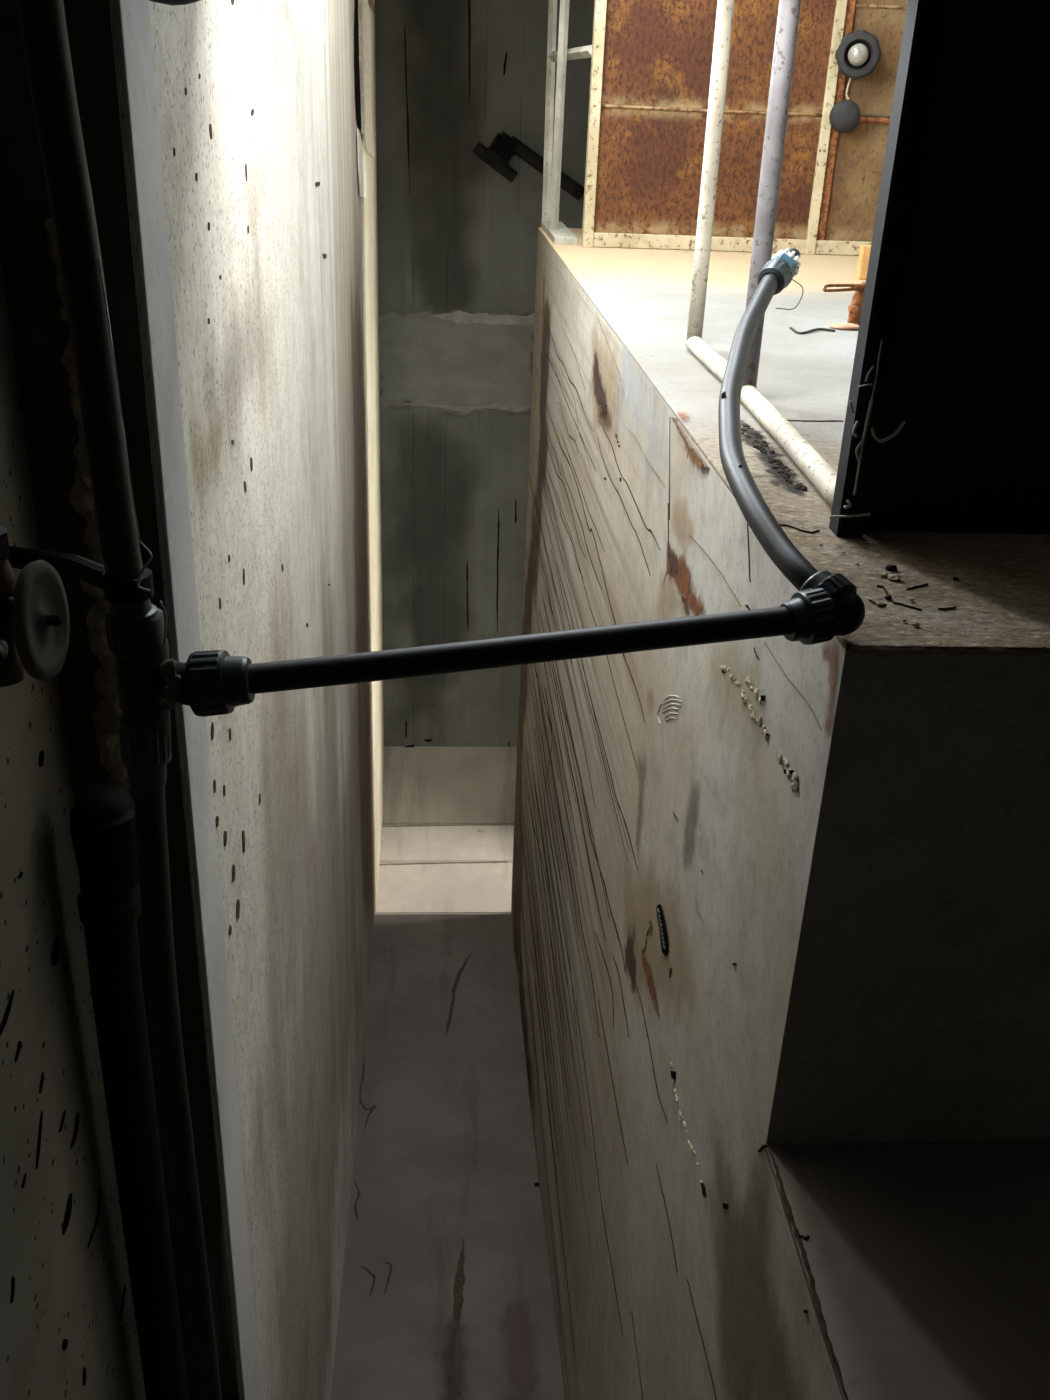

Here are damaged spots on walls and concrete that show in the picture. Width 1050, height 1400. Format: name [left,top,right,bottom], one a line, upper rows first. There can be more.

corrosion [667,543,704,616]
crack [447,1239,465,1400]